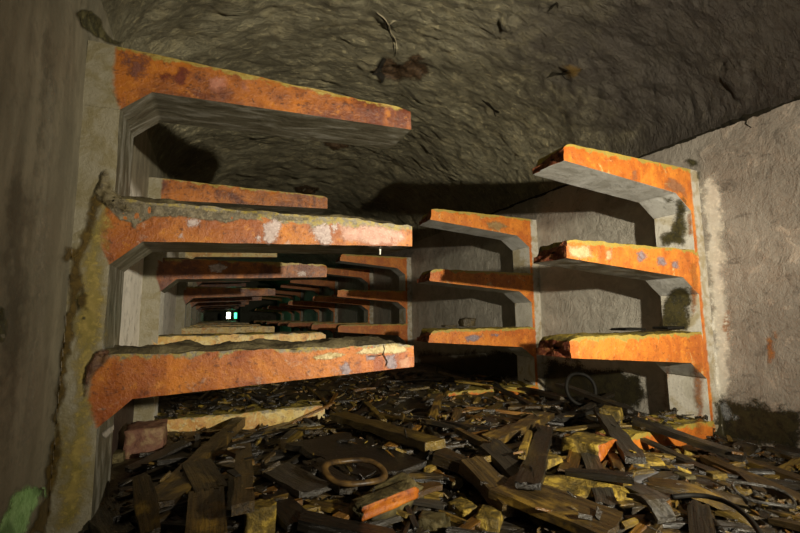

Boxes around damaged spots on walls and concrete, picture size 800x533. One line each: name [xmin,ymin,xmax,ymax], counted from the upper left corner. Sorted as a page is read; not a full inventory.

spalling [95,170,308,246]
spalling [294,185,319,195]
mould [660,199,687,246]
mould [663,287,691,330]
leakage [700,177,800,448]
leakage [30,194,109,533]
corrosion [694,367,703,434]